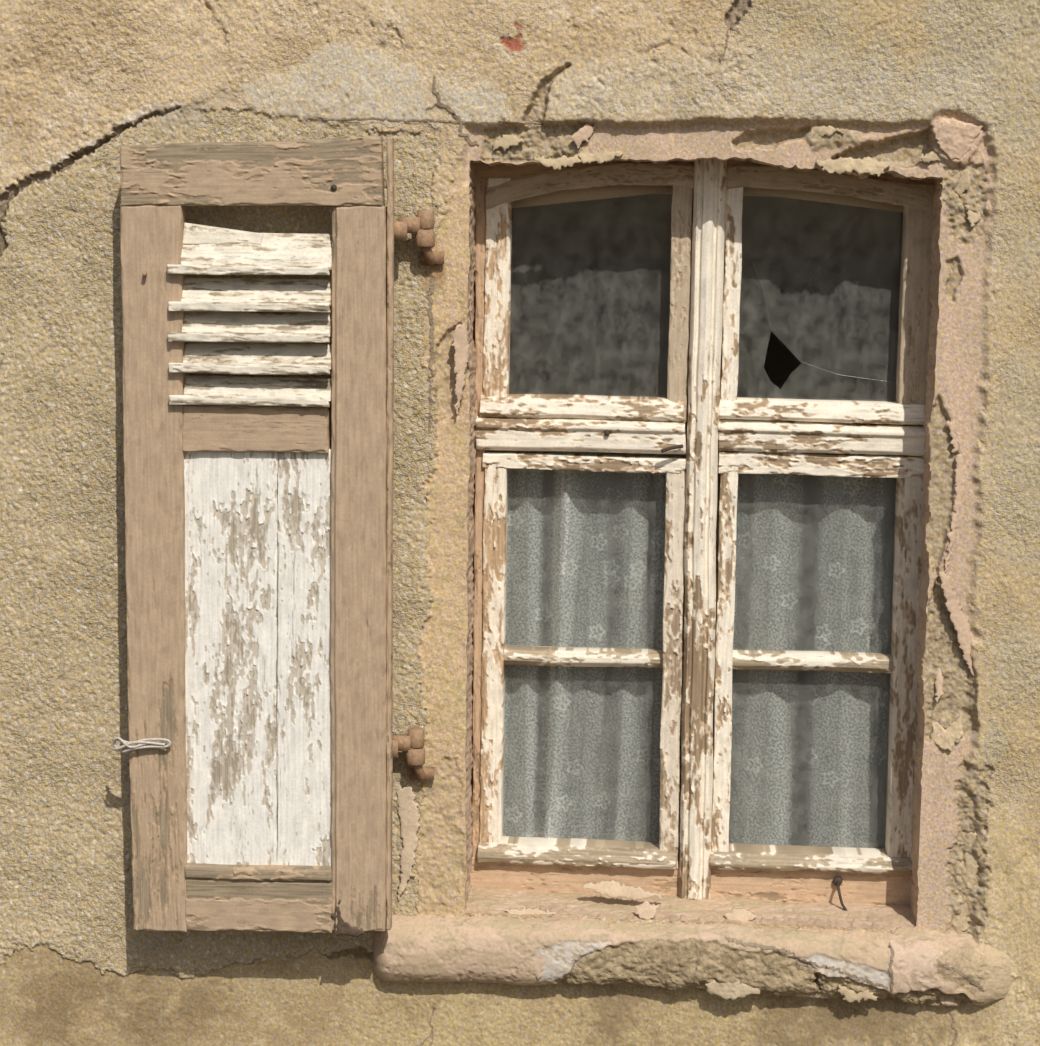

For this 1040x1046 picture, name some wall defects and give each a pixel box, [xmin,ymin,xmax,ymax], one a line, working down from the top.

crack [0,105,181,257]
spalling [481,63,623,170]
crack [720,0,752,63]
spalling [732,124,844,151]
spalling [816,124,988,303]
spalling [0,108,441,979]
spalling [392,233,471,735]
peeling [921,396,980,751]
peeling [392,751,934,950]
spalling [945,760,995,942]
spalling [0,938,1024,1046]